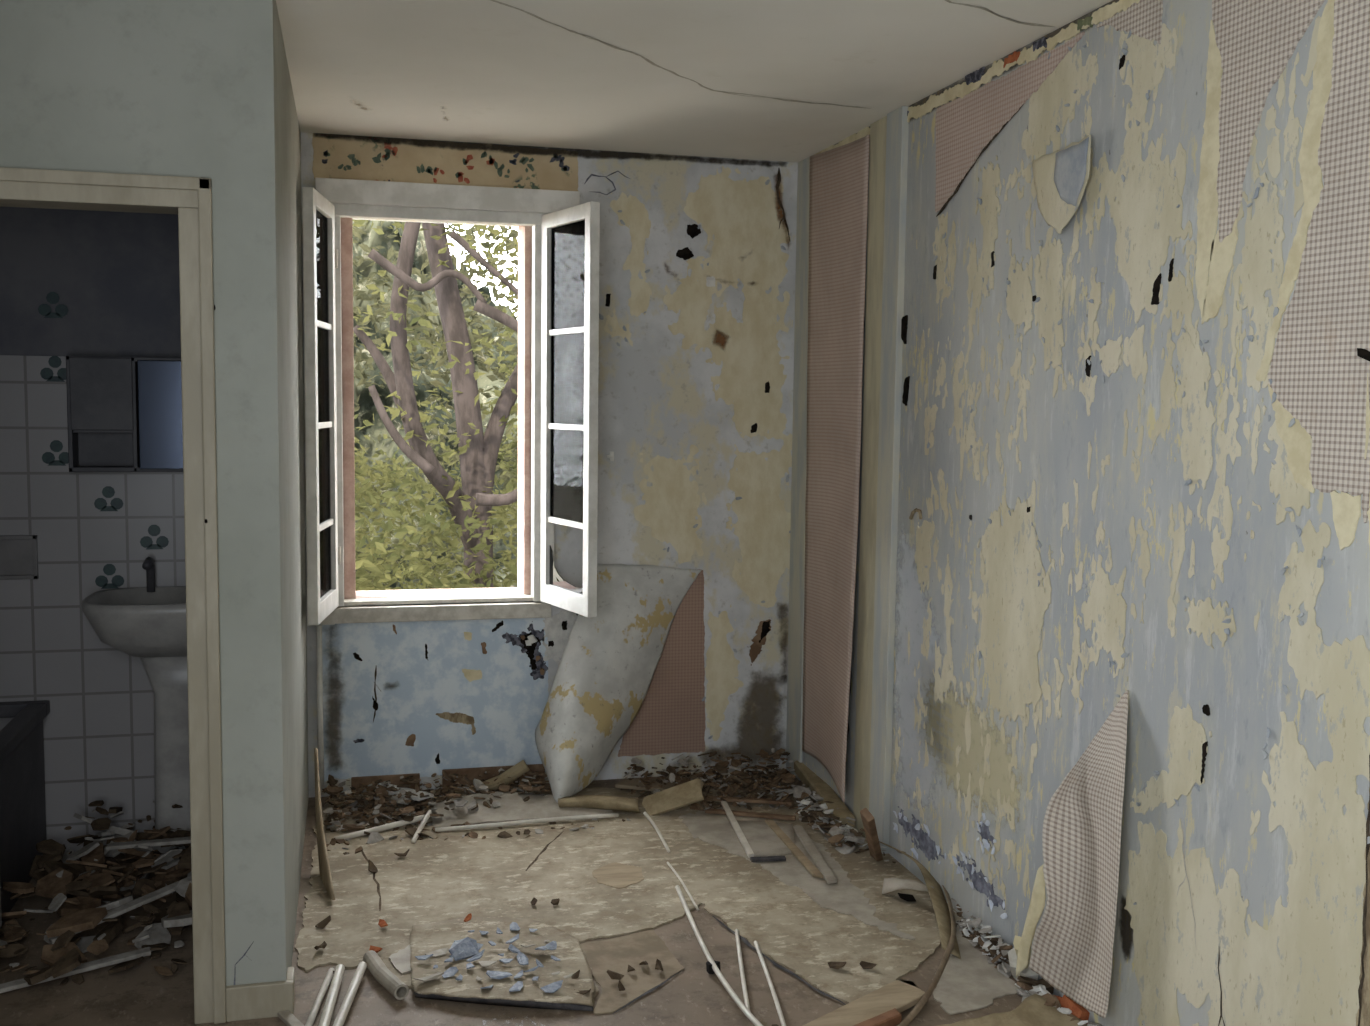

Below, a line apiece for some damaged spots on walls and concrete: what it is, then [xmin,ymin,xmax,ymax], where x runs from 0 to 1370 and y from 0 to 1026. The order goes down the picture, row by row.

crack [491,0,871,109]
crack [945,0,1054,27]
peeling [599,166,793,741]
peeling [892,16,1370,1026]
flaking render [462,611,578,682]
spalling [435,712,476,735]